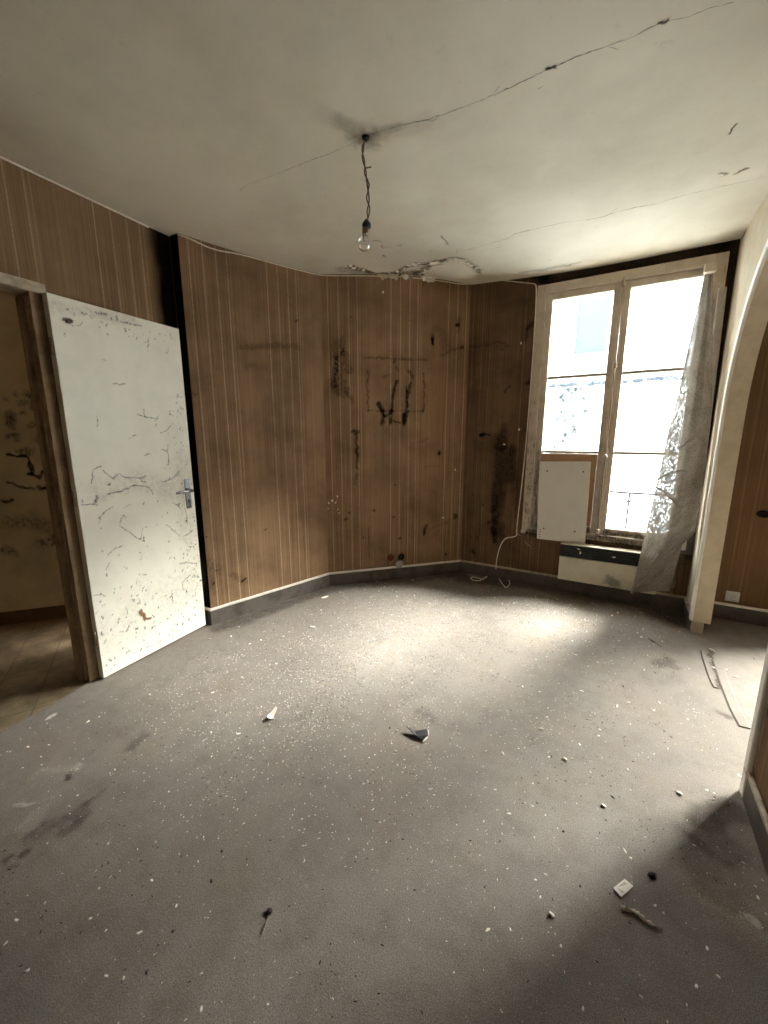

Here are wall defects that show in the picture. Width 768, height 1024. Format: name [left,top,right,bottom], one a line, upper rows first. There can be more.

peeling [348,257,481,283]
water stain [2,391,46,503]